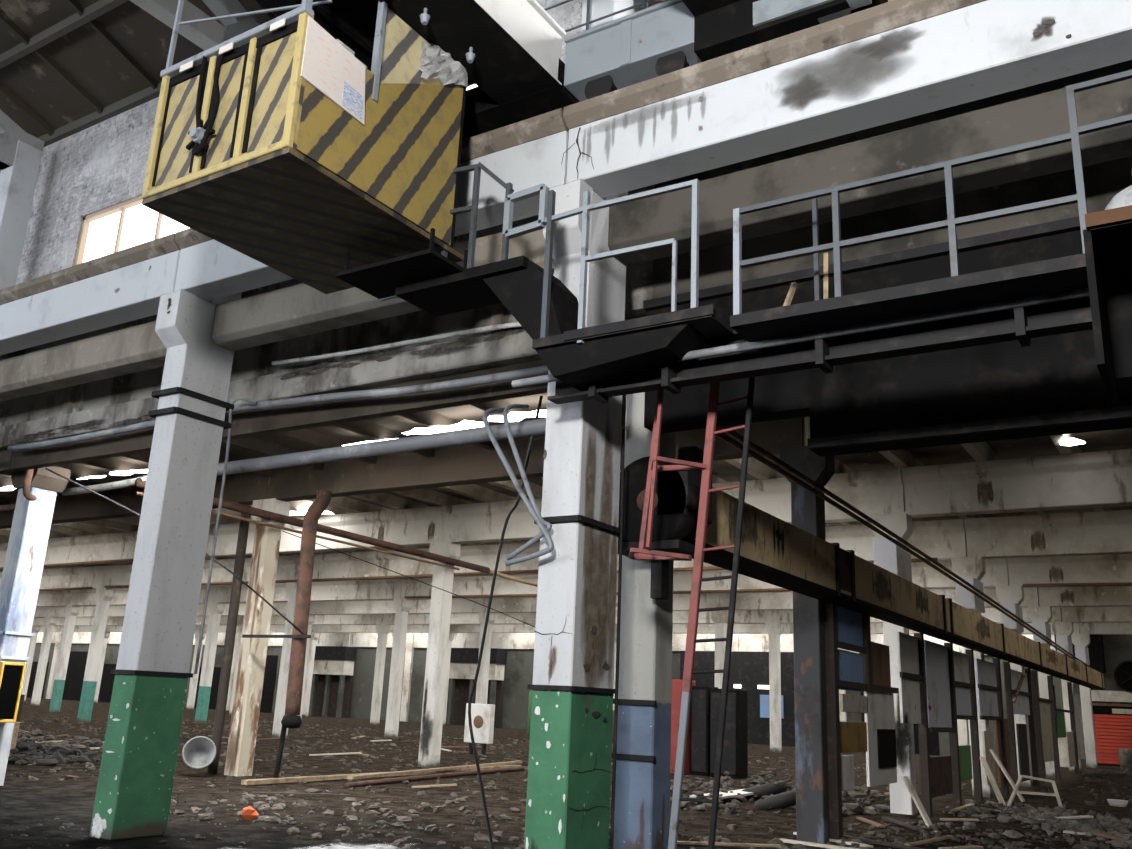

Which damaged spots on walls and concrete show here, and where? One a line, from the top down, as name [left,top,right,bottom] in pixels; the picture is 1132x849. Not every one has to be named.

water stain [862,31,916,55]
water stain [786,81,820,106]